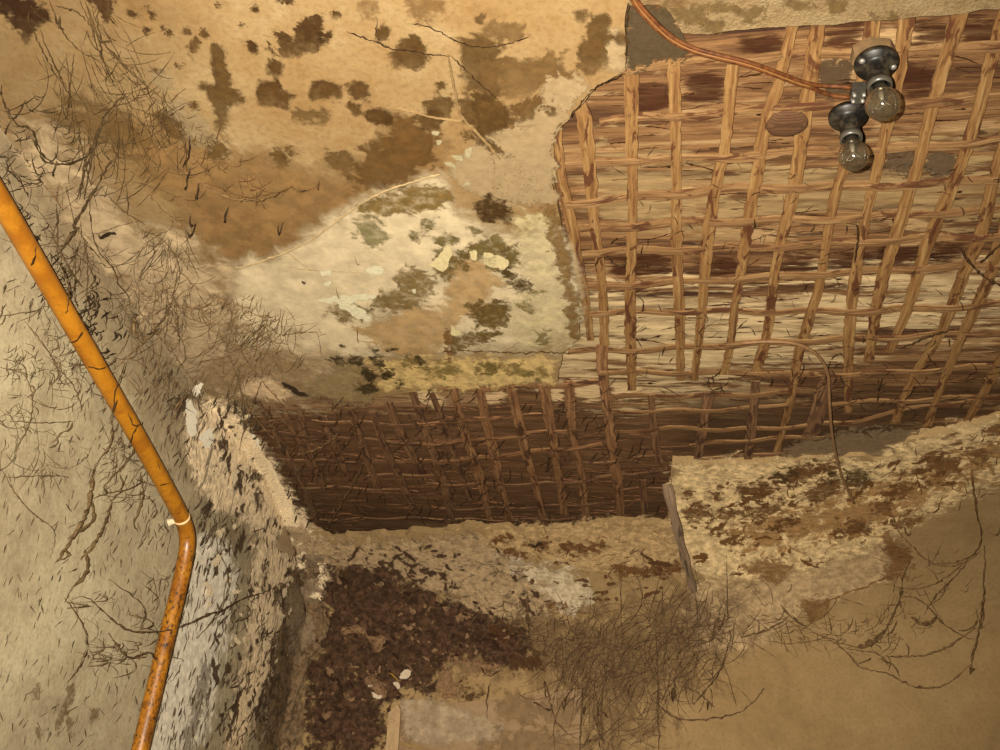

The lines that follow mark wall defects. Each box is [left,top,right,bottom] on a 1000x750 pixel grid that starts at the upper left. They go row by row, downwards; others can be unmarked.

damp [86,0,115,22]
spalling [663,0,765,34]
spalling [786,0,816,10]
spalling [827,0,848,14]
crack [348,20,582,129]
flaking render [444,27,627,208]
peeling [428,245,452,272]
peeling [469,250,509,270]
damp [17,5,1000,535]
peeling [315,270,377,322]
damp [724,436,1000,586]
damp [796,594,829,623]